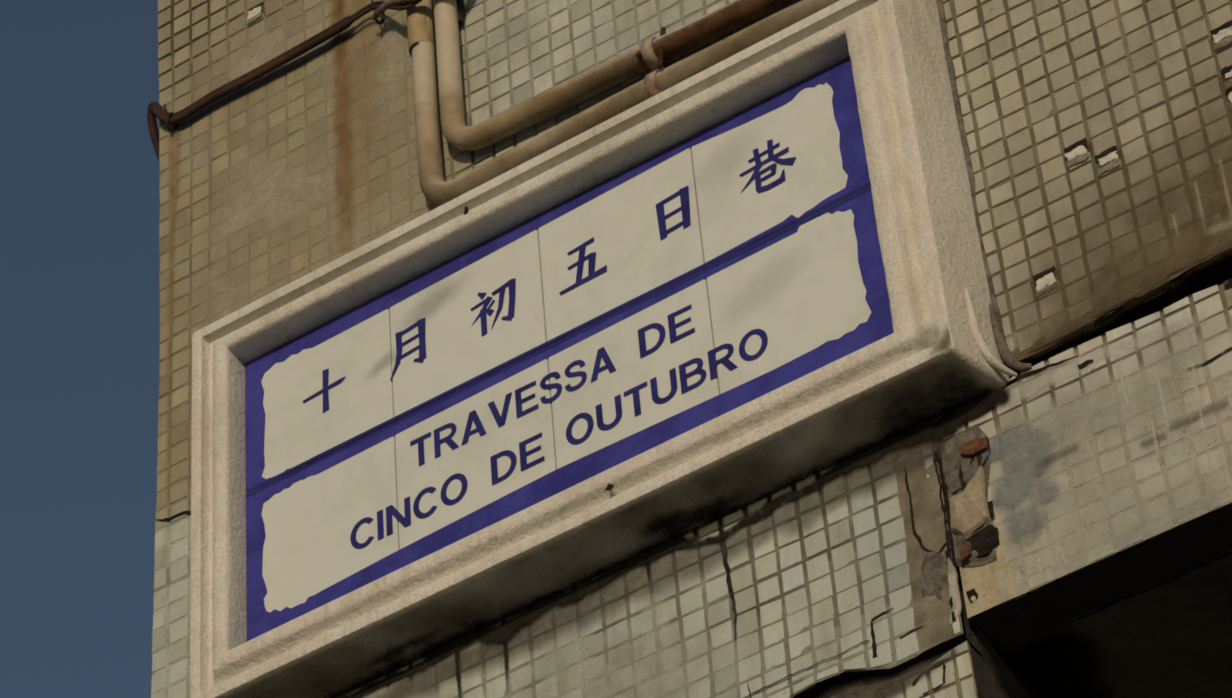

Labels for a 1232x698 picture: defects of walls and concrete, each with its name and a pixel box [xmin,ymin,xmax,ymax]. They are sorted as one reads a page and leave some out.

water stain [227,36,290,76]
crack [1002,247,1232,388]
water stain [234,329,1172,698]
crack [718,539,737,641]
crack [743,450,983,698]
spalling [920,425,999,624]